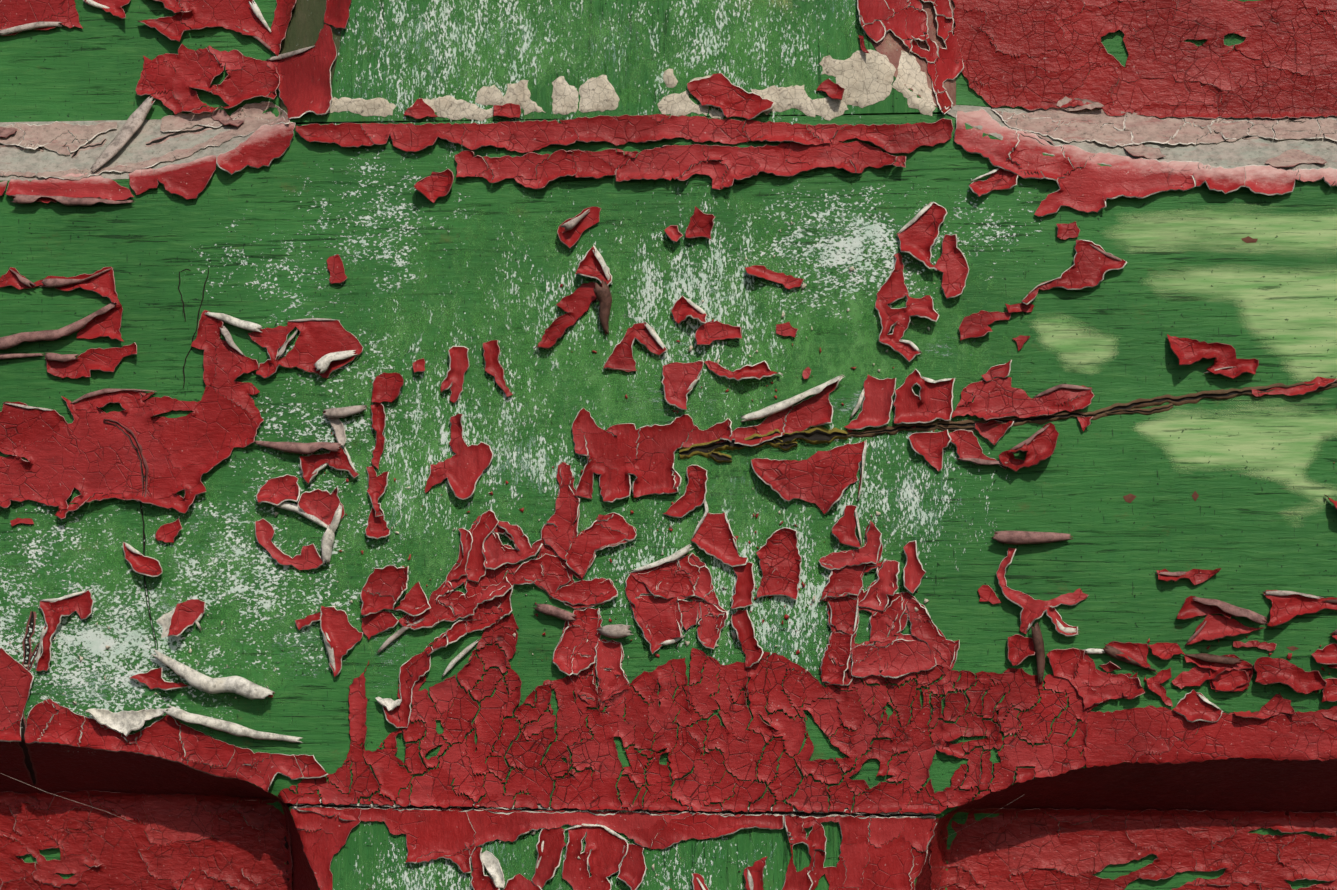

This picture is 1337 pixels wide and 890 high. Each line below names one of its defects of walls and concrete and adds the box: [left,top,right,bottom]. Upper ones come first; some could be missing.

peeling [0,0,1337,341]
crack [1009,126,1055,146]
crack [1242,117,1306,140]
crack [679,378,1337,463]
peeling [0,202,1337,890]
crack [292,799,936,819]